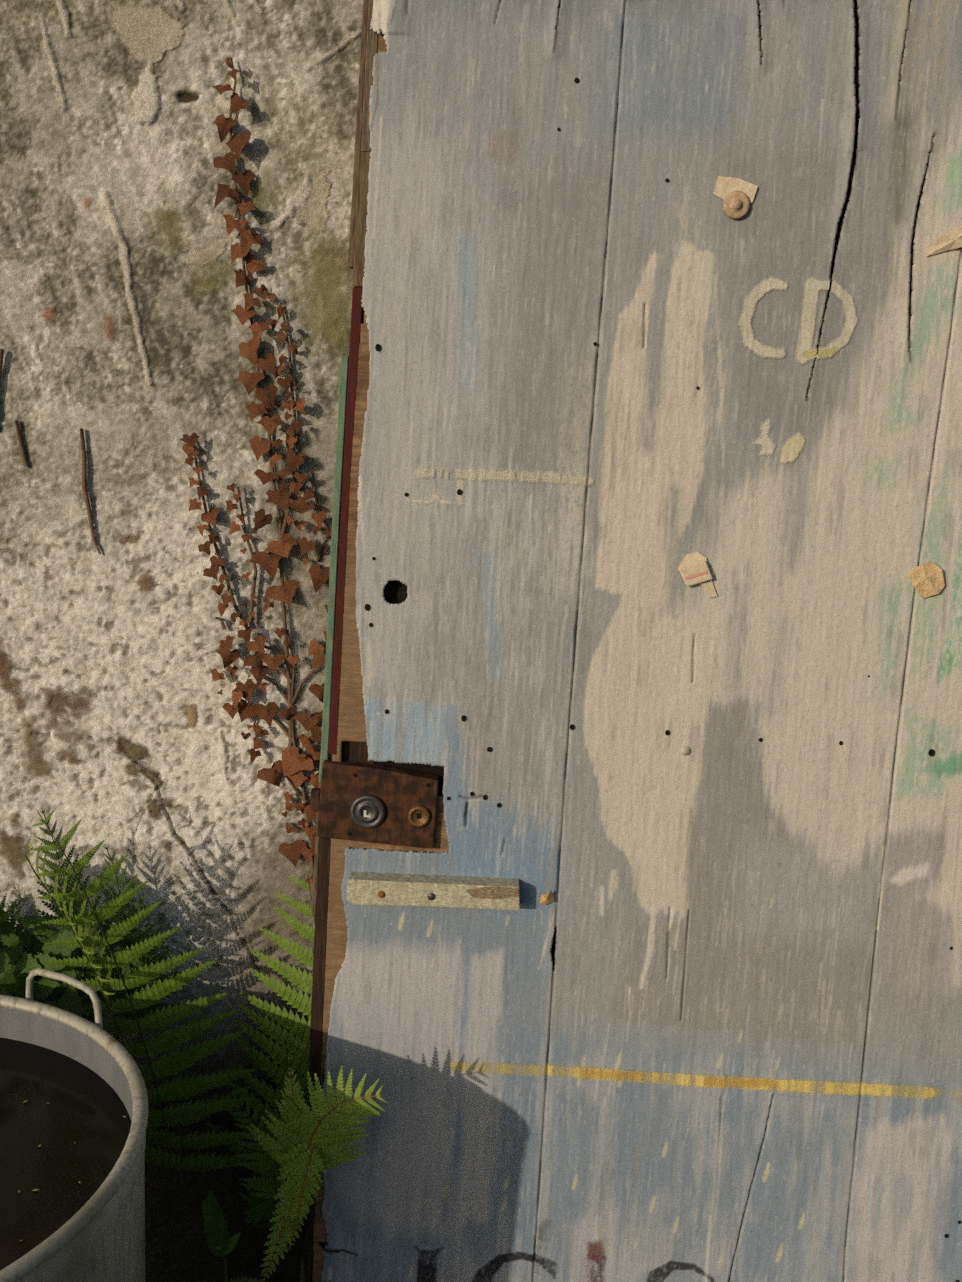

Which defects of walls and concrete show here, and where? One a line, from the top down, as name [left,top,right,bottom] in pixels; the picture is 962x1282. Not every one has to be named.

crack [220,730,228,780]
crack [134,760,264,973]